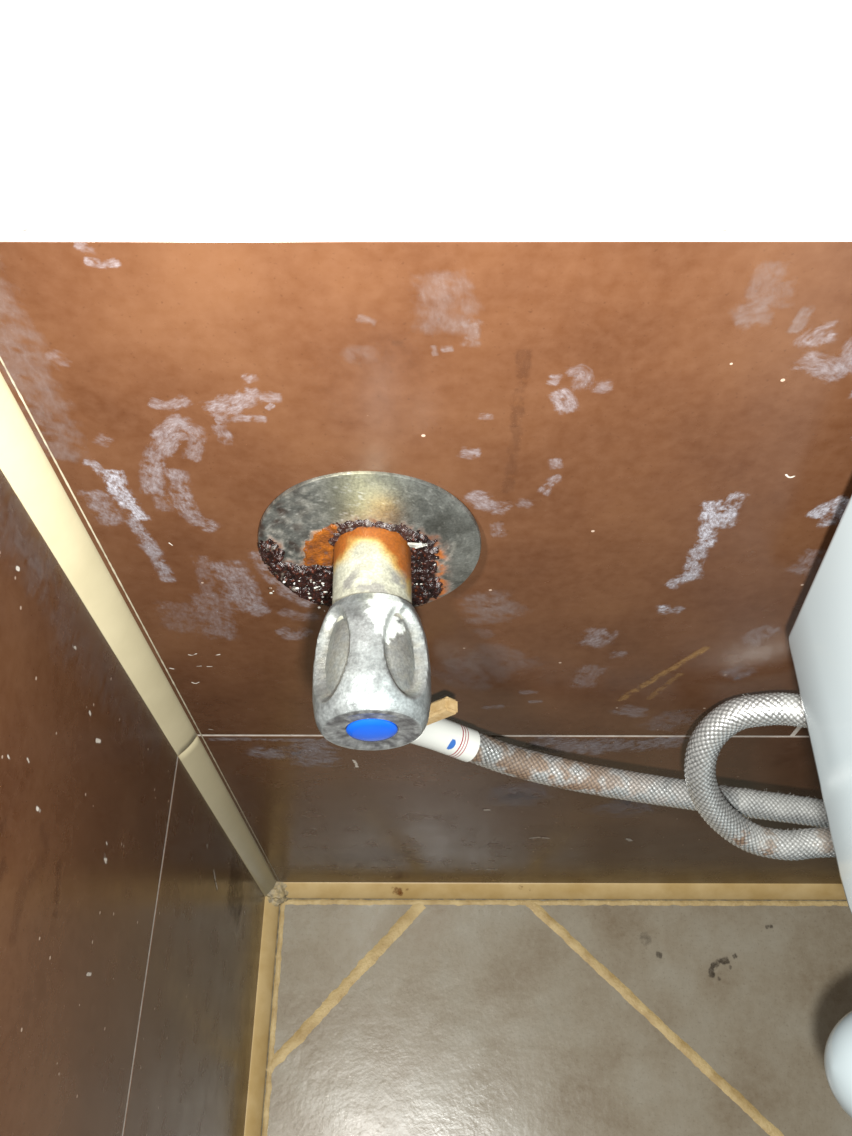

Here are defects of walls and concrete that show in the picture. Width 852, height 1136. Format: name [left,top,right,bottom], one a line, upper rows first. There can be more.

damp [107,472,144,520]
damp [702,502,735,547]
corrosion [257,519,444,608]